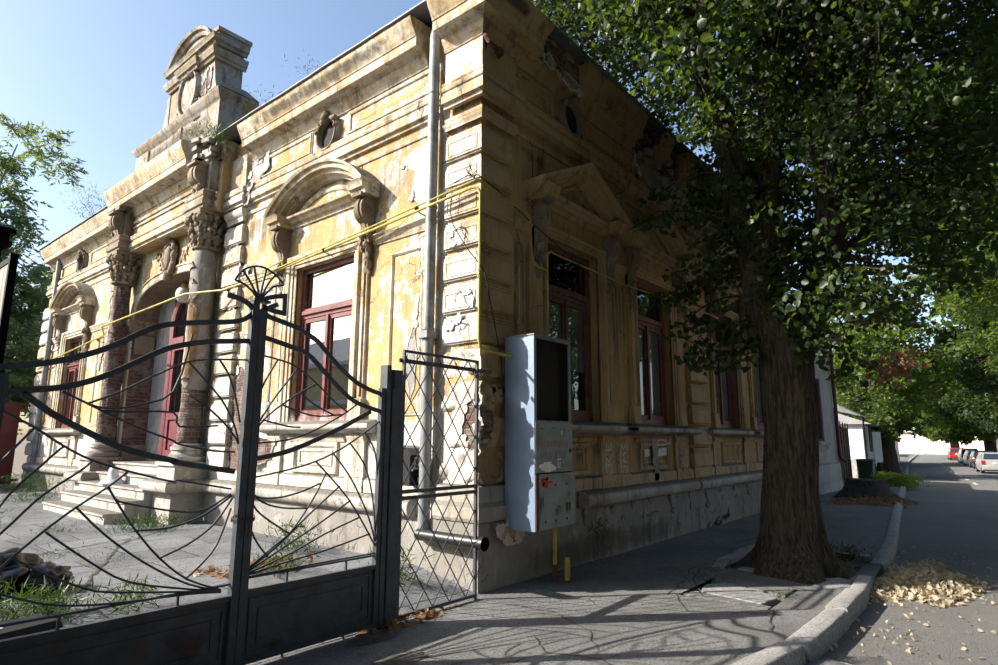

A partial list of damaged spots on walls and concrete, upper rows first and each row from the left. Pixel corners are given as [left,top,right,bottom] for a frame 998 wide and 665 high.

peeling [400,142,427,215]
peeling [448,229,465,248]
peeling [444,288,474,331]
peeling [406,294,422,403]
flaking render [460,384,505,456]
crack [496,603,664,665]